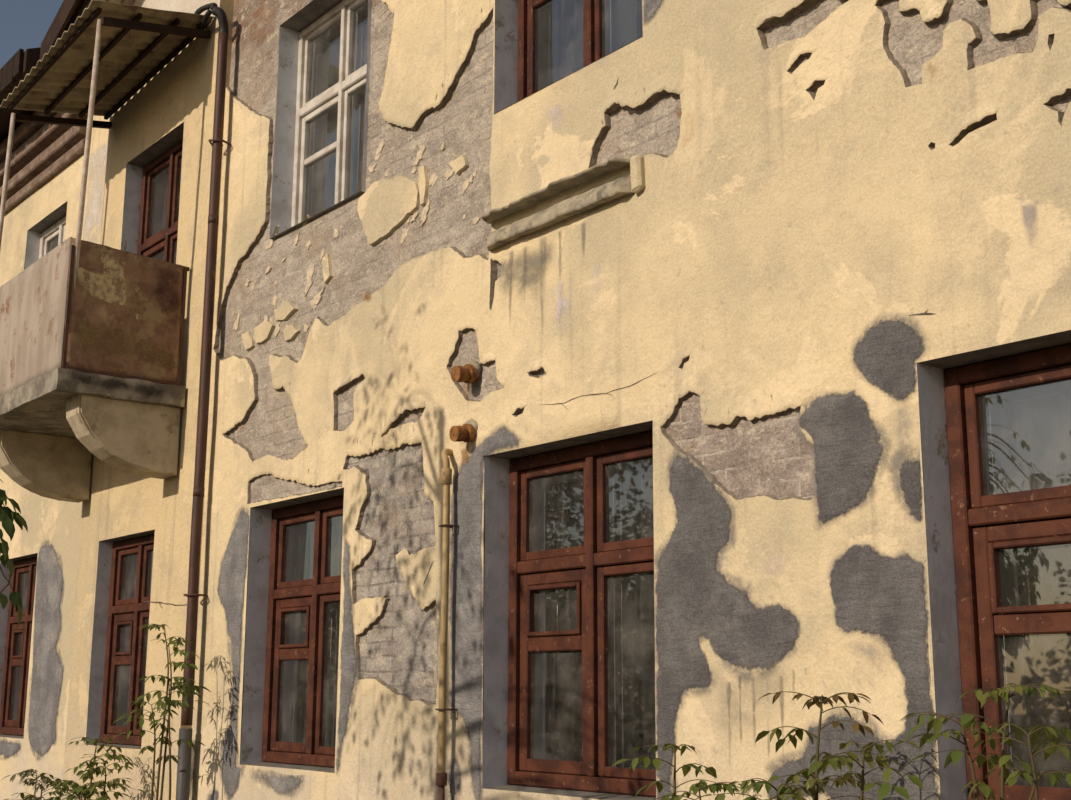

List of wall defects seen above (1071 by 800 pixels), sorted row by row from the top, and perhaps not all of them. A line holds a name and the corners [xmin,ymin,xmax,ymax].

spalling [588,72,685,168]
spalling [750,0,849,74]
spalling [806,70,829,100]
spalling [872,0,1071,87]
spalling [1044,76,1071,126]
spalling [213,0,505,705]
crack [544,374,653,410]
spalling [660,350,816,500]